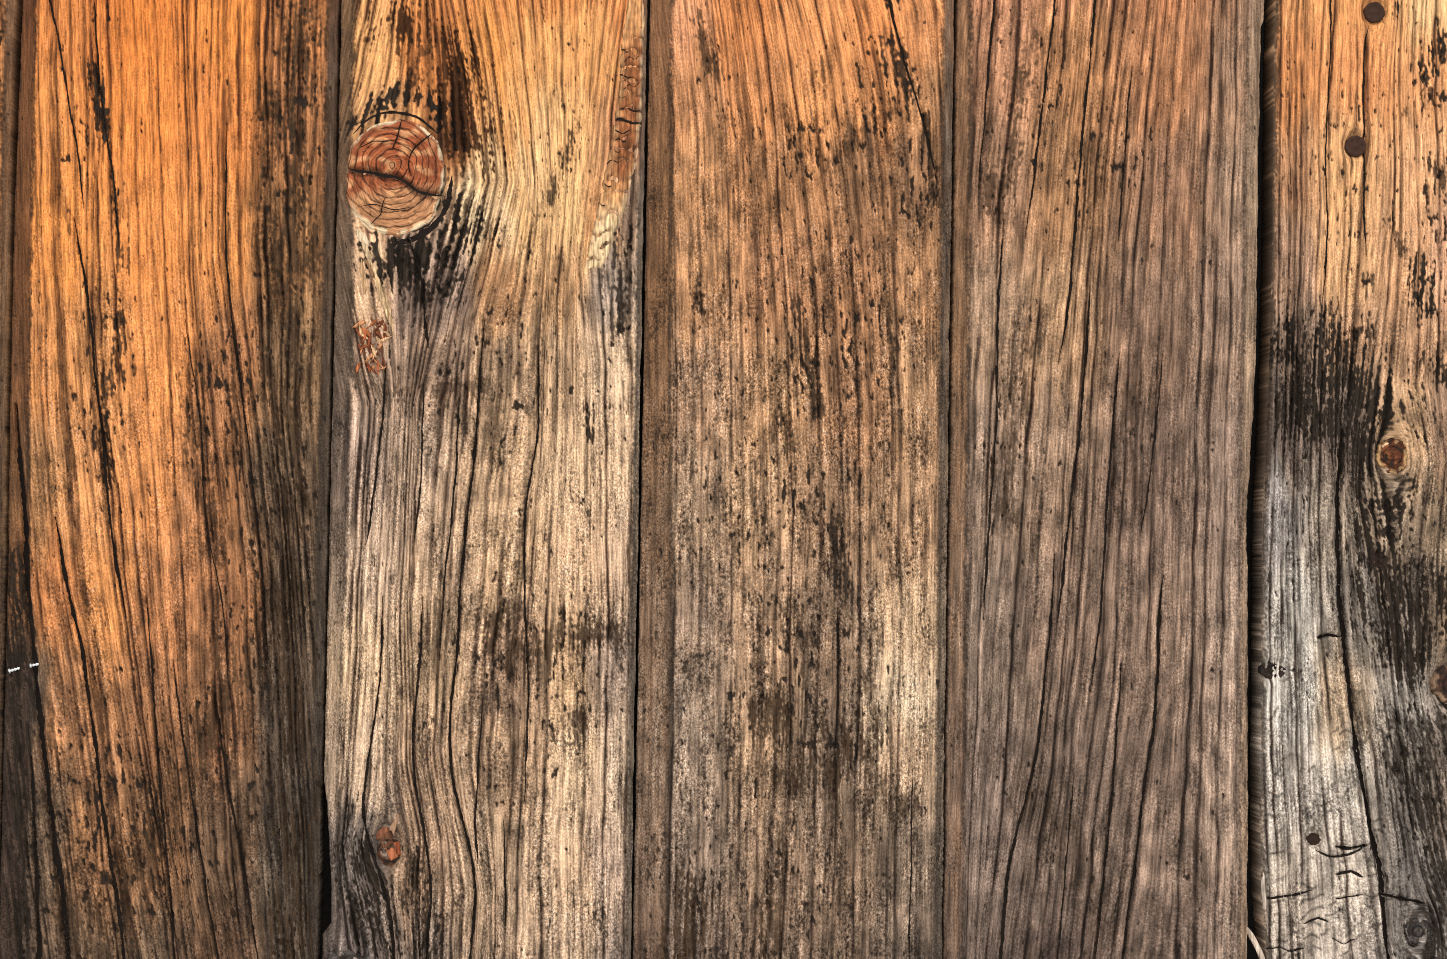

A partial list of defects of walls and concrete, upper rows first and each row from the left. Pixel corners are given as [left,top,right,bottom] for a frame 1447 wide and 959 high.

crack [1266,435,1425,959]